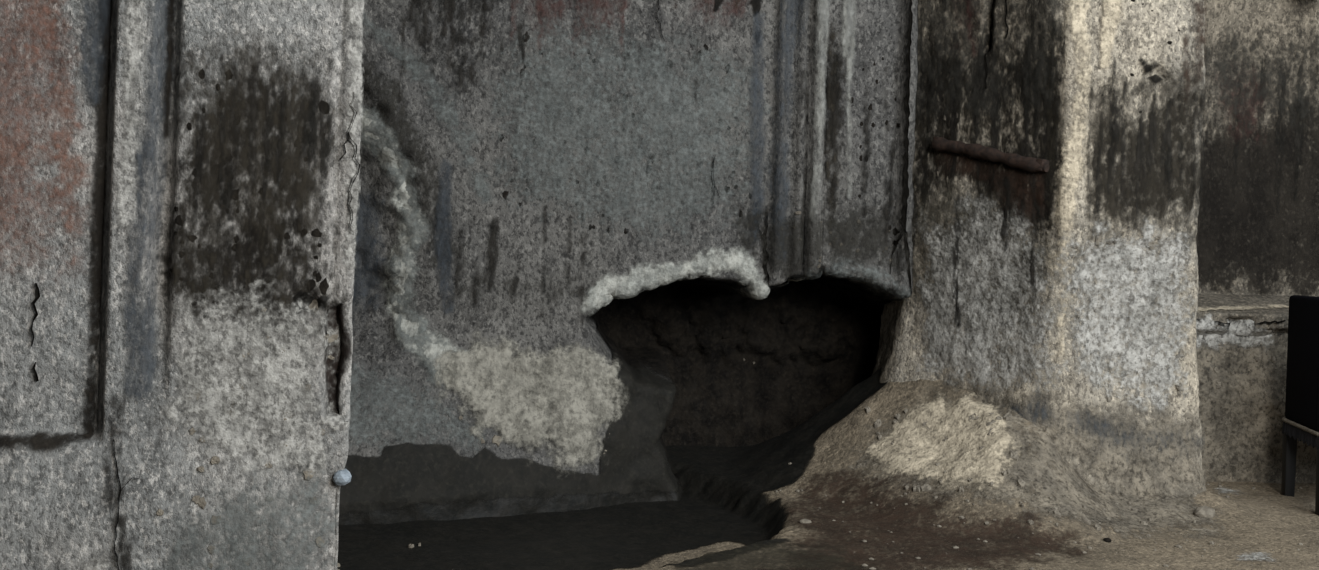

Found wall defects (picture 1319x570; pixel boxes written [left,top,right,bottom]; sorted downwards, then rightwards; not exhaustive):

crack [31,283,40,382]
damp [0,432,94,451]
damp [105,0,527,570]
spalling [582,248,906,459]
flaking render [865,198,1060,492]
damp [782,0,1319,331]
flaking render [1063,223,1316,482]